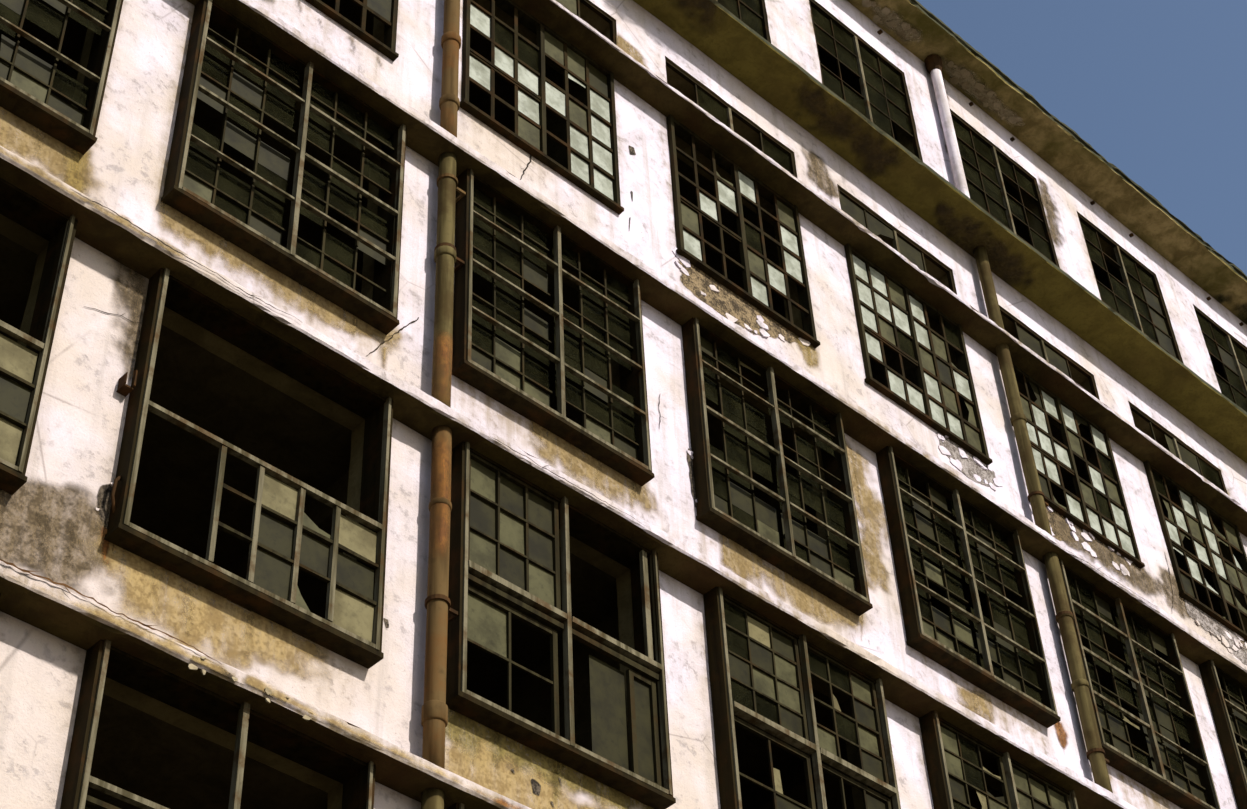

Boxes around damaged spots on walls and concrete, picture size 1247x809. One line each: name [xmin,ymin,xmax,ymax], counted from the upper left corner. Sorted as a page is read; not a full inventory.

damp [936,204,1032,285]
damp [1039,179,1062,246]
crack [367,317,419,356]
rust [438,337,452,393]
spalling [672,247,810,347]
rust [436,443,449,549]
damp [846,442,888,591]
spalling [937,431,1003,491]
peeling [1046,506,1132,577]
damp [73,538,411,760]
peeling [1185,599,1247,666]
damp [431,730,608,809]